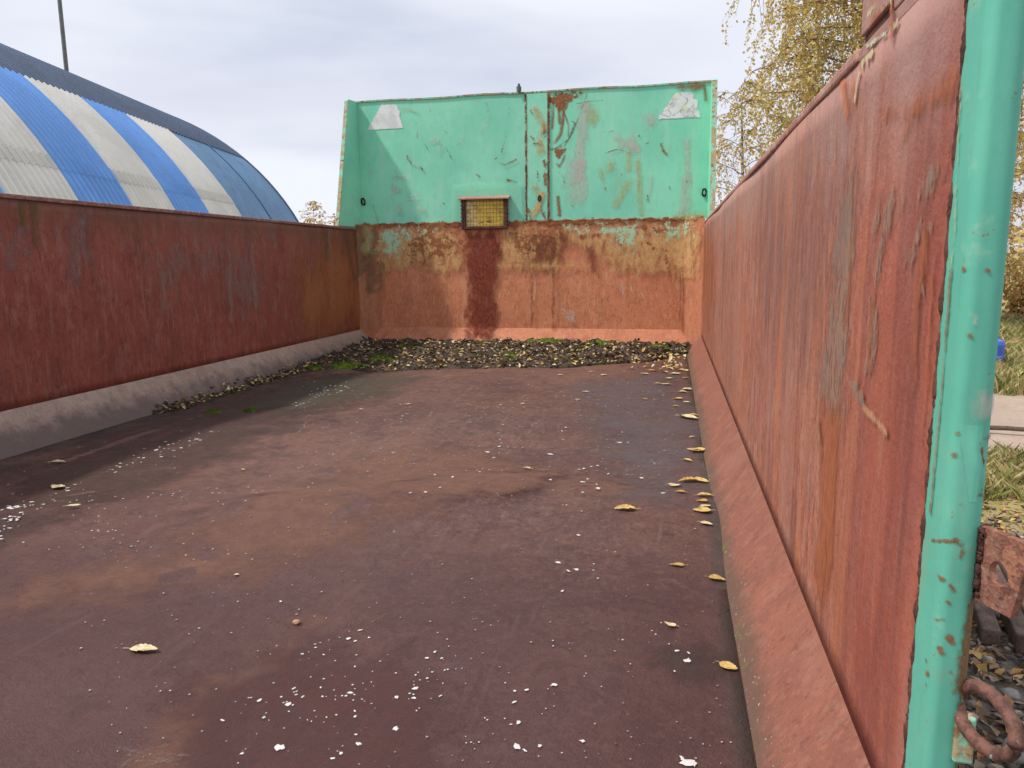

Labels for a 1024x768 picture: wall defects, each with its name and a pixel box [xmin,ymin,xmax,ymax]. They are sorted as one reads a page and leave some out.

peeling [368,223,468,275]
corrosion [355,220,503,340]
peeling [569,102,590,203]
peeling [498,136,701,278]
corrosion [508,91,713,330]
corrosion [814,406,839,612]
corrosion [937,596,974,710]